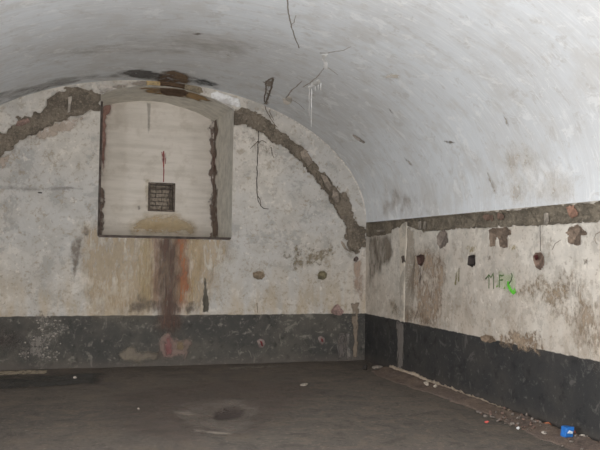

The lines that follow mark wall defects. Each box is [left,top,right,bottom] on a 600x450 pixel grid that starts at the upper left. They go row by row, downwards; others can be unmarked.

crack [287,0,299,48]
spalling [0,84,117,168]
crack [264,47,350,127]
spalling [234,107,600,265]
water stain [72,216,225,312]
peeling [119,333,192,362]
corrosion [144,239,194,332]
water stain [370,237,392,276]
water stain [396,251,443,368]